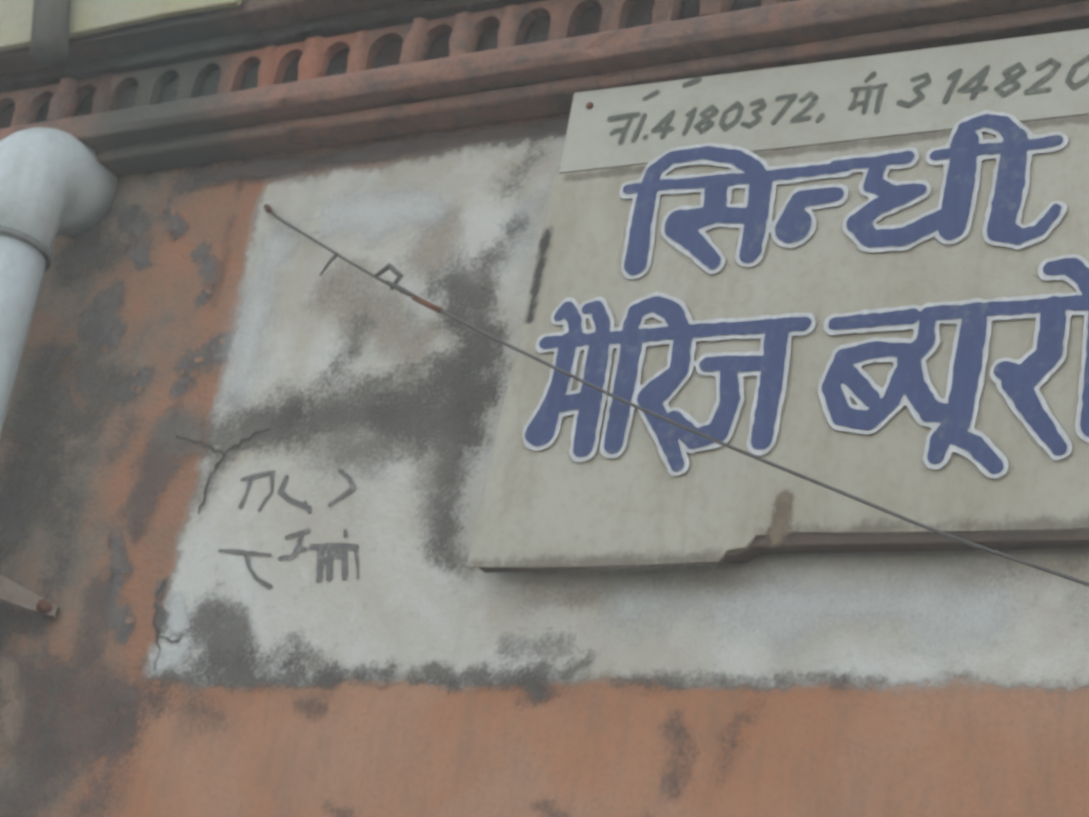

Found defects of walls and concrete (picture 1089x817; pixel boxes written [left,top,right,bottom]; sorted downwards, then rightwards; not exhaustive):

damp [526,229,551,323]
damp [209,191,528,566]
damp [128,410,200,539]
crack [176,428,271,514]
damp [161,599,395,688]
damp [408,654,592,699]